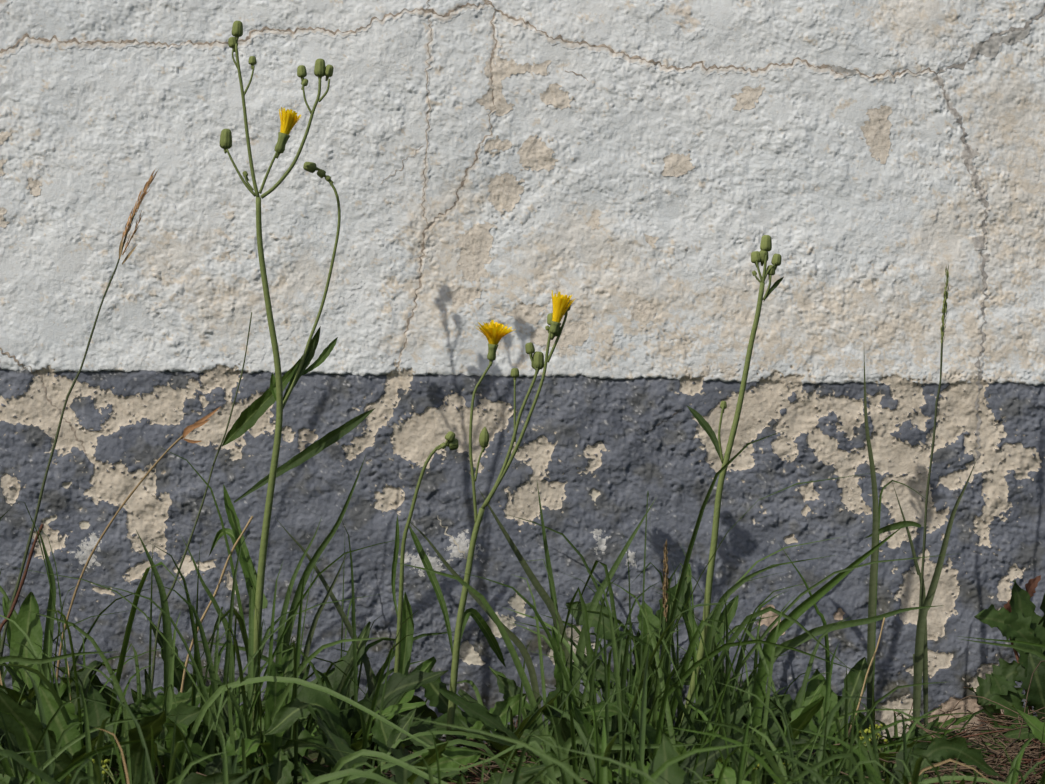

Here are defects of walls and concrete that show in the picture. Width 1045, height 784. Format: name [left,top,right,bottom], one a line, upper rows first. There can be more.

crack [0,0,1045,462]
peeling [0,357,318,602]
peeling [335,359,570,532]
peeling [576,434,610,505]
peeling [670,366,1045,678]
peeling [864,654,1004,749]